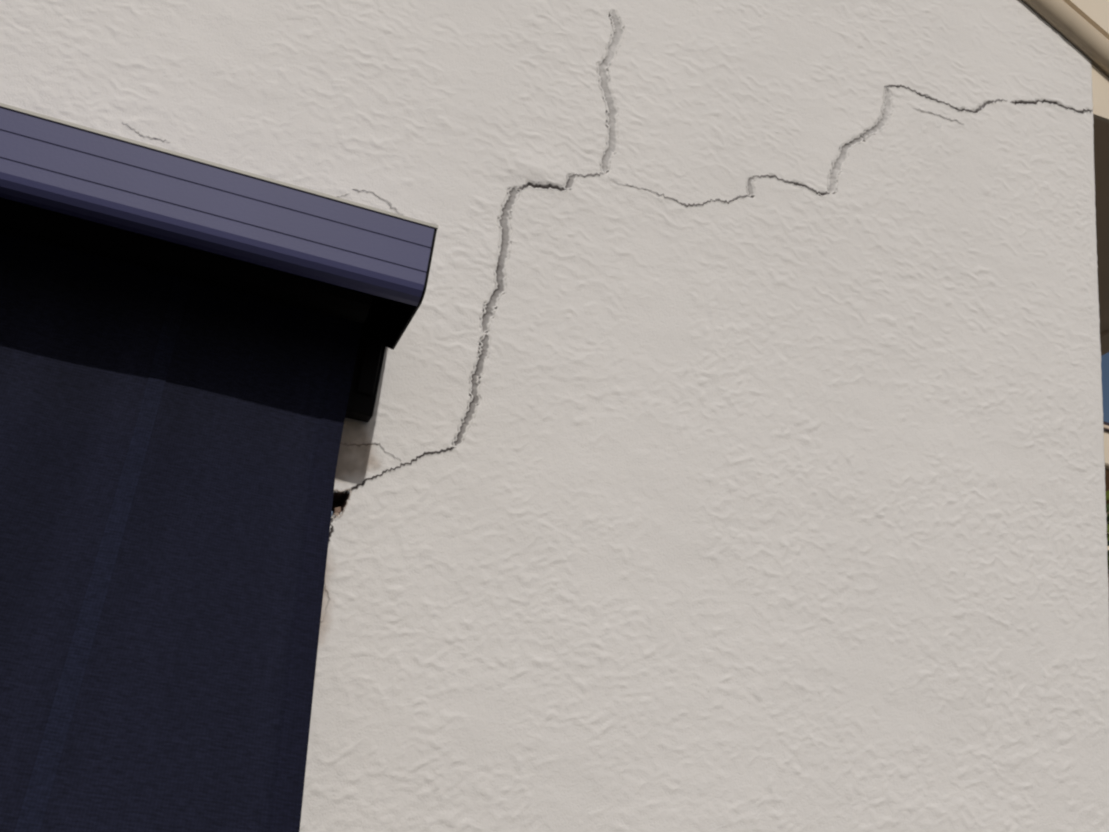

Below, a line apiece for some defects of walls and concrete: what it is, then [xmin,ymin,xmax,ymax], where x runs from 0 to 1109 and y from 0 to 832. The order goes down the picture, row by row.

crack [314,188,437,225]
crack [340,9,1094,493]
crack [328,515,338,546]
crack [320,572,331,623]